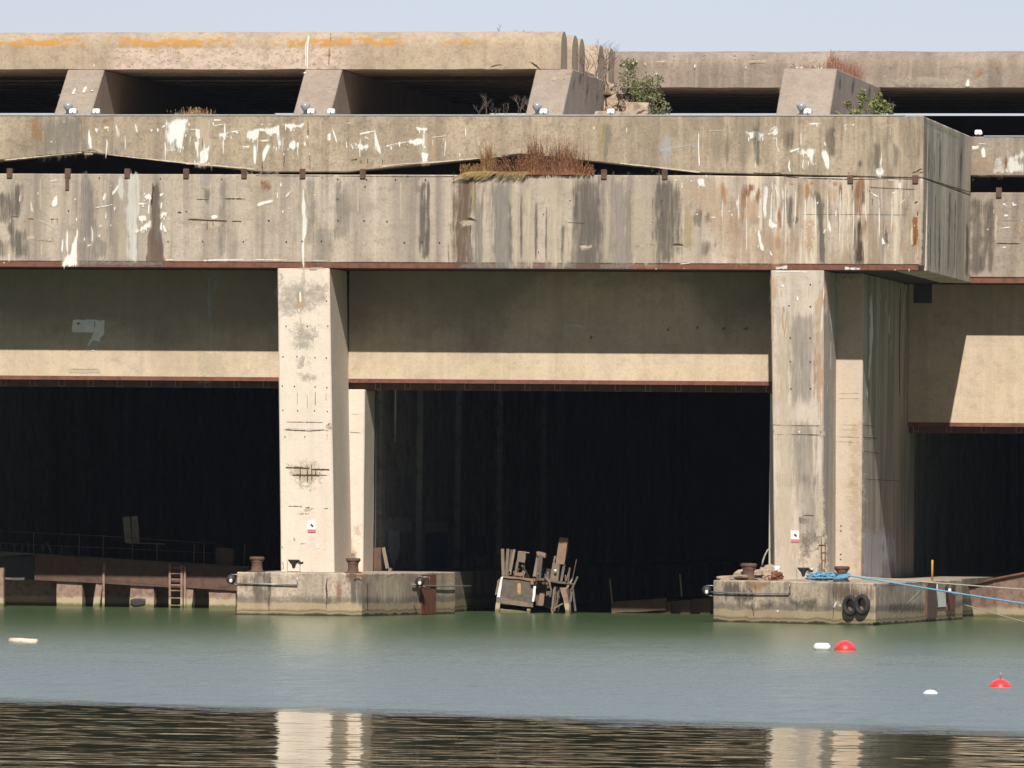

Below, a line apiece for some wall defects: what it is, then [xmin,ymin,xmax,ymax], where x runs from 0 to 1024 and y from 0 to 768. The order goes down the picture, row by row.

water stain [738,124,854,171]
water stain [0,185,39,263]
water stain [61,174,173,267]
water stain [453,176,630,269]
water stain [620,130,724,261]
rust [742,184,760,220]
water stain [919,196,1017,276]
water stain [711,145,905,579]
spalling [287,464,329,491]